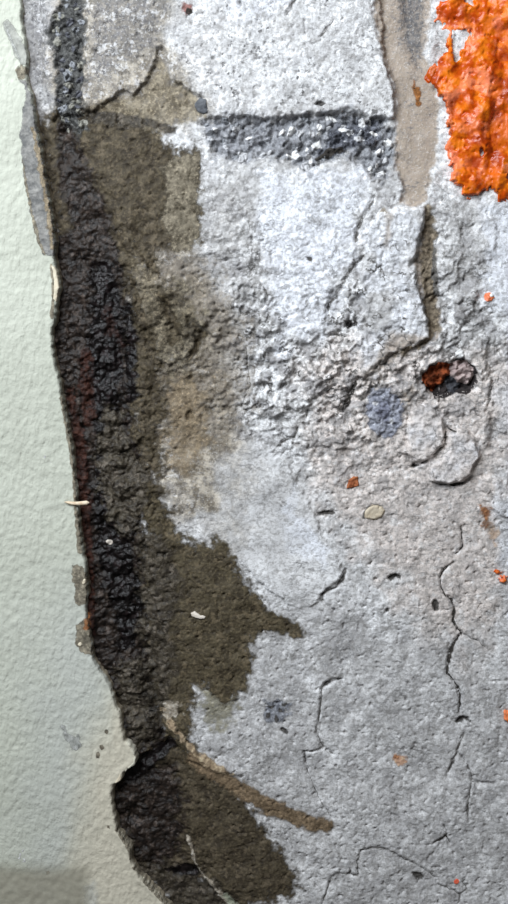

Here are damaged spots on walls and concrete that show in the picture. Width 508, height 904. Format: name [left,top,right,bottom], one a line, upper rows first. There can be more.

spalling [44,0,90,140]
corrosion [412,81,421,106]
flaking render [3,19,61,319]
leakage [431,248,439,295]
flaking render [59,393,83,554]
leakage [39,62,333,904]
flaking render [71,565,90,606]
flaking render [75,618,95,655]
crack [321,570,346,611]
crack [440,528,485,711]
crack [304,678,342,816]
crack [323,847,467,903]